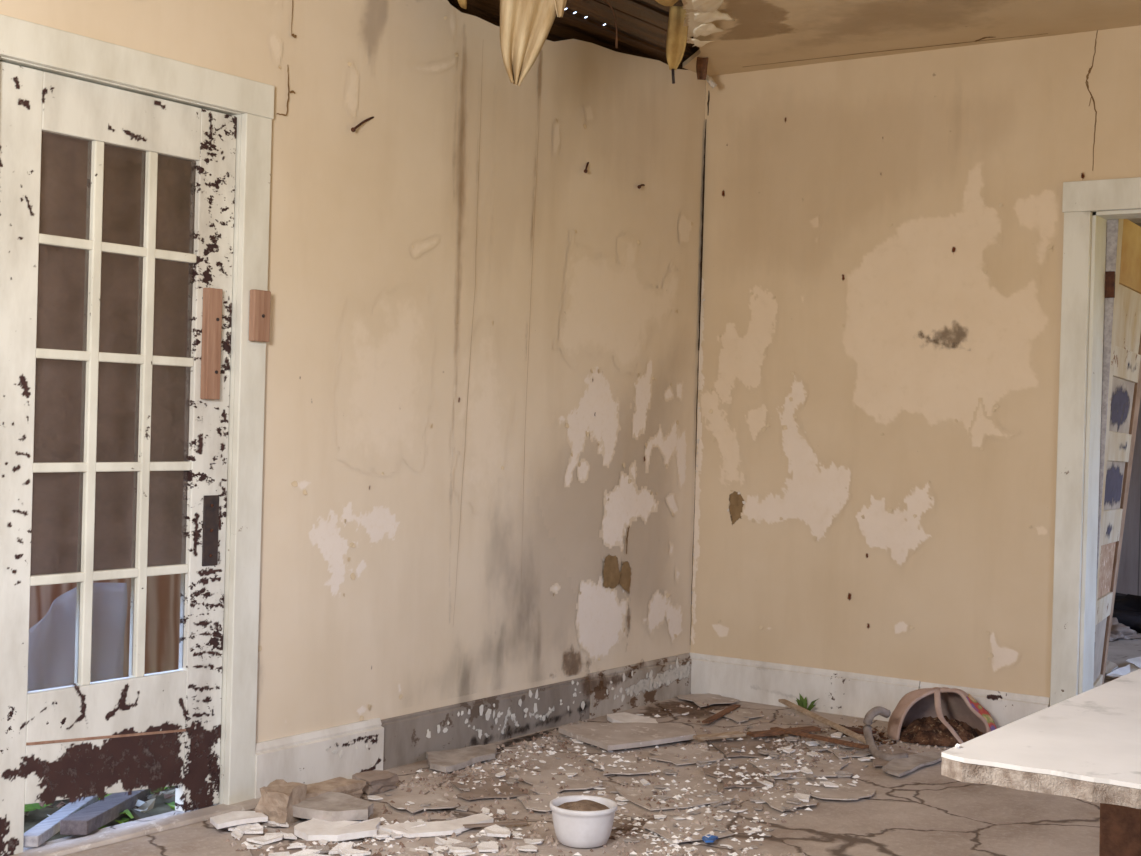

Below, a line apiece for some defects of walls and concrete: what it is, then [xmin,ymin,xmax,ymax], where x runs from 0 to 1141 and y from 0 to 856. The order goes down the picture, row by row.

peeling [682,0,738,47]
crack [1085,30,1098,171]
peeling [838,156,1061,451]
peeling [550,277,937,663]
peeling [306,500,404,599]
peeling [426,680,585,739]
peeling [606,658,690,702]
peeling [986,629,1021,673]